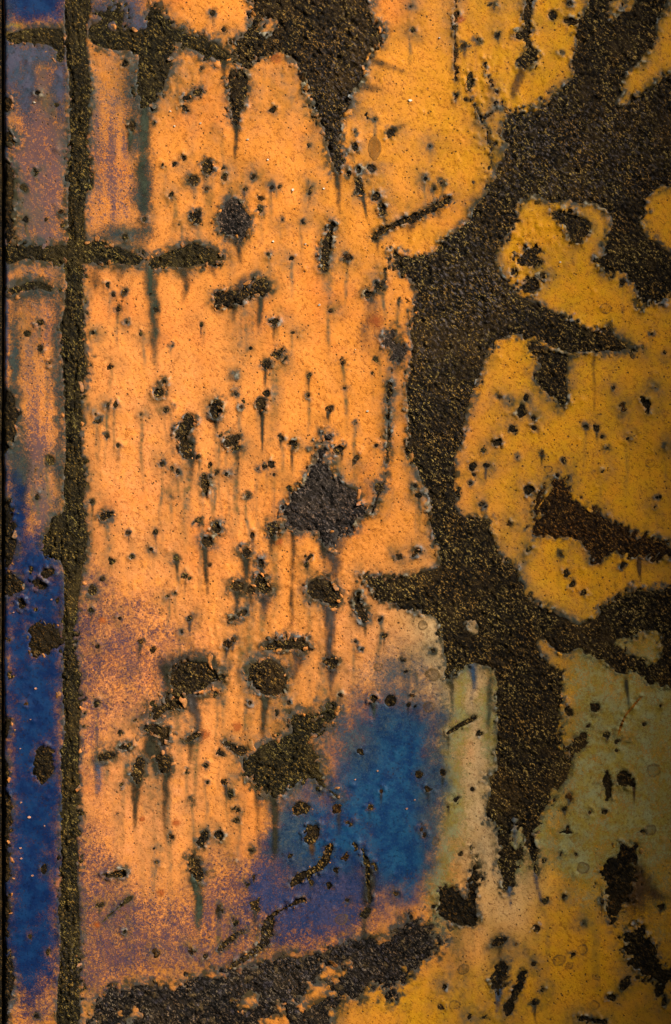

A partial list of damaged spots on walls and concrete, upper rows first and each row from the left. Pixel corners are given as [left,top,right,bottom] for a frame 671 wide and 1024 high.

rust [4,0,488,1024]
rust [203,0,671,904]